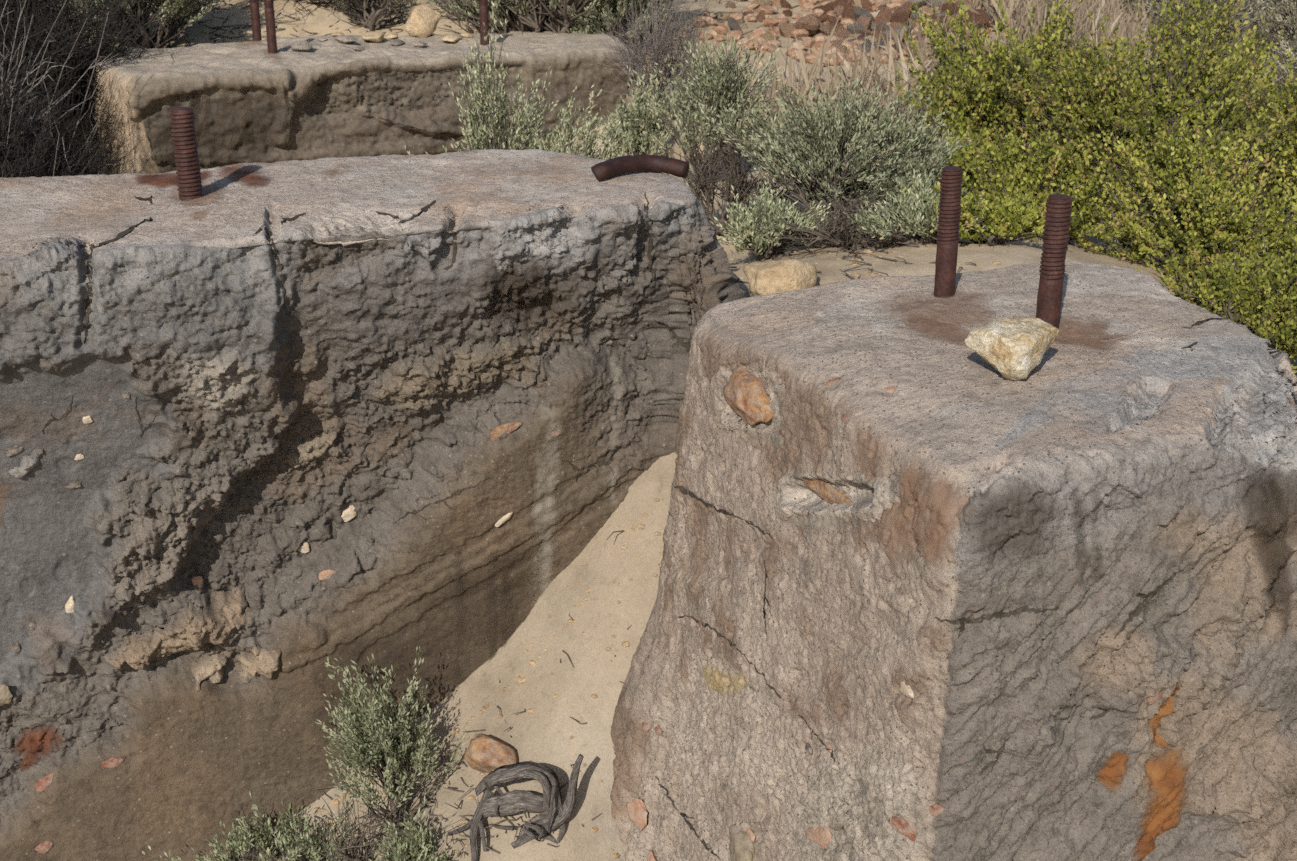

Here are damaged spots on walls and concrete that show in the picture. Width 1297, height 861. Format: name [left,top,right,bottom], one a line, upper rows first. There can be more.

rust [138,173,179,195]
rust [224,166,268,185]
crack [253,213,305,310]
spalling [767,468,906,522]
crack [671,482,772,631]
crack [671,615,840,764]
rust [1099,753,1128,787]
rust [1136,687,1185,861]